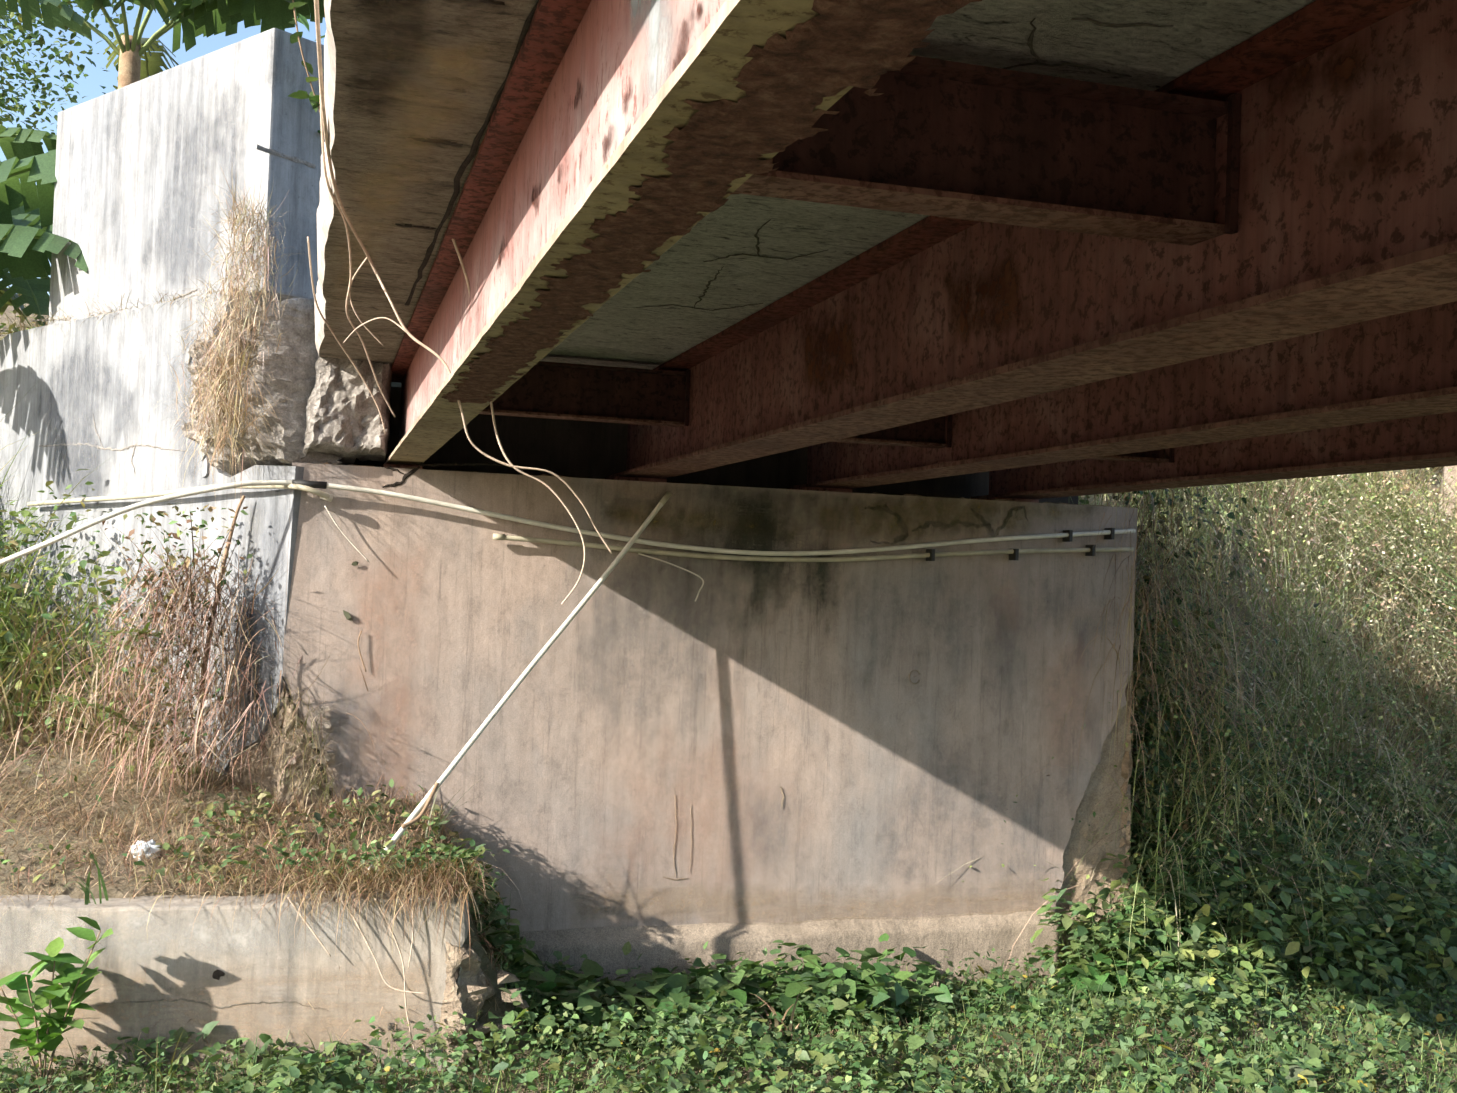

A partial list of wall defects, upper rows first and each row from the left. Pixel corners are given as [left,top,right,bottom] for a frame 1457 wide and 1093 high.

peeling [672,3,701,71]
leakage [144,90,243,285]
corrosion [441,0,982,404]
crack [635,219,828,311]
leakage [39,351,110,495]
spalling [180,298,393,478]
leakage [808,548,829,604]
flaking render [1055,675,1133,959]